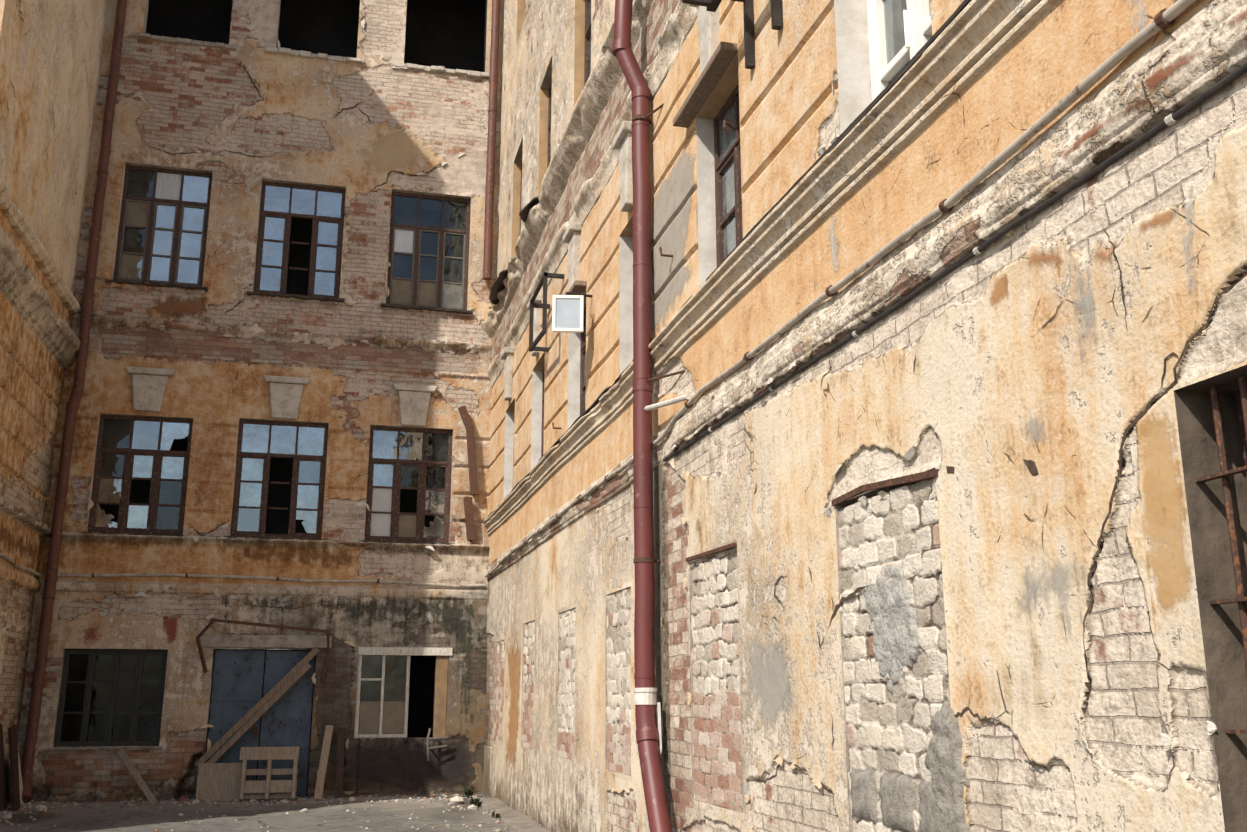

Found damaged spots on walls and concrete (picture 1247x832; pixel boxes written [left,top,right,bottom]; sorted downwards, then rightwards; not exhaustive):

spalling [96,0,490,418]
crack [333,101,372,122]
crack [366,159,448,192]
crack [1101,224,1127,330]
spalling [661,65,1247,832]
crack [1080,266,1247,720]
spalling [0,574,41,777]
damp [321,596,476,718]